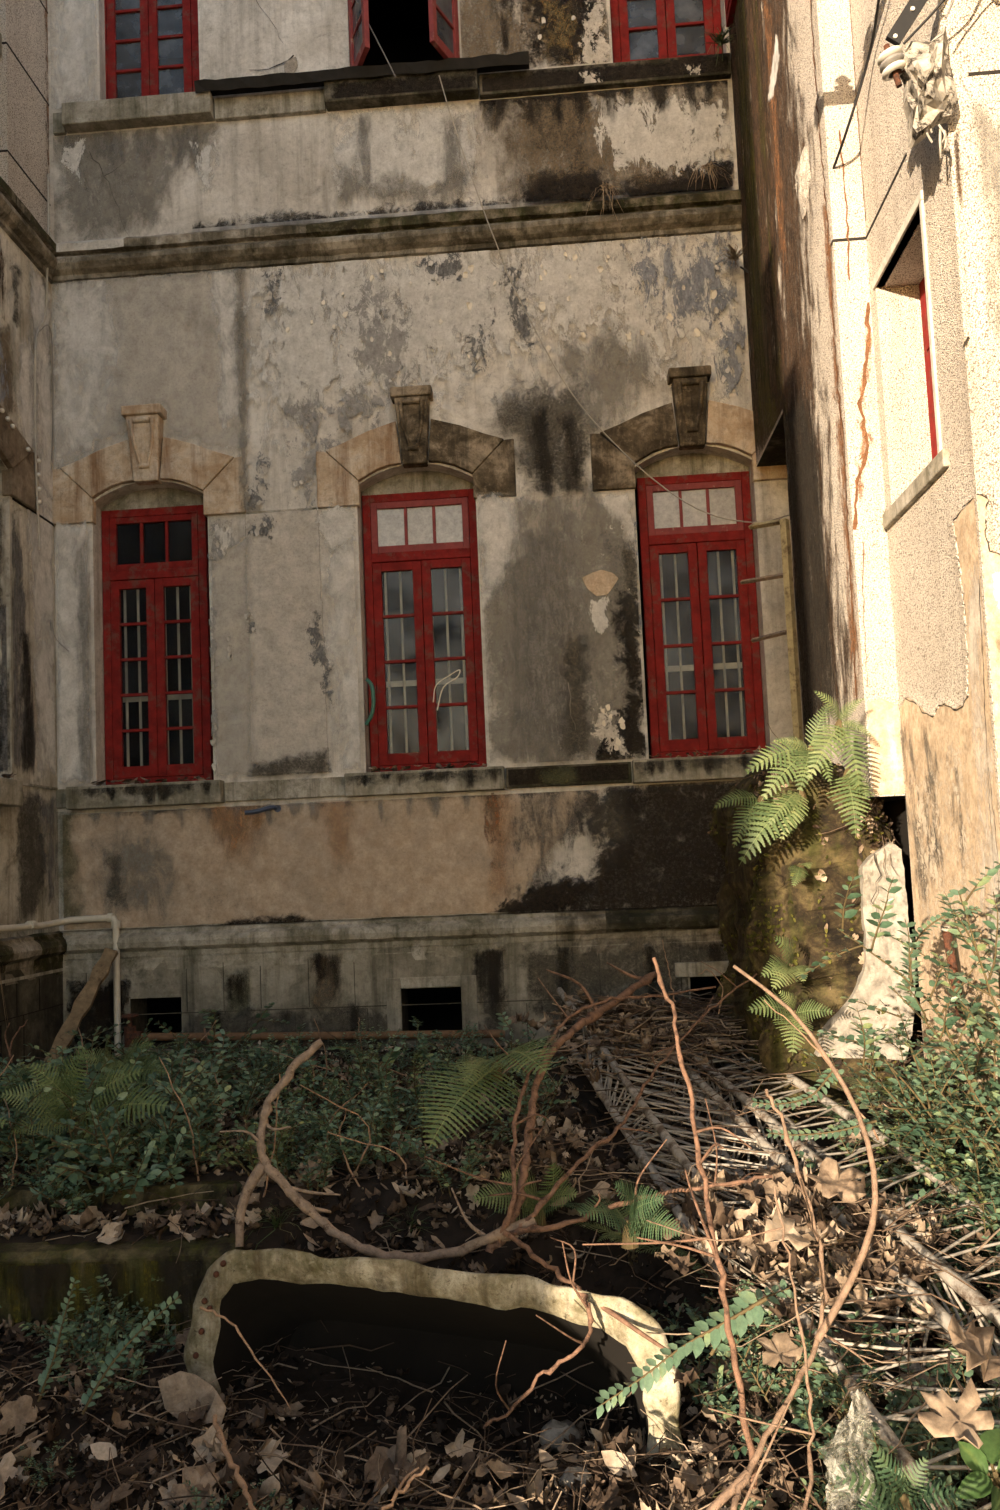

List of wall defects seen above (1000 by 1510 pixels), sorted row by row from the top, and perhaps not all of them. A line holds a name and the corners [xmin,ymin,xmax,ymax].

leakage [0,243,211,918]
leakage [54,123,216,240]
leakage [197,267,250,508]
peeling [306,610,337,708]
leakage [248,541,411,819]
peeling [207,231,750,589]
leakage [193,0,787,456]
leakage [425,324,763,914]
peeling [580,489,642,635]
peeling [590,701,632,756]
crack [810,0,871,698]
spalling [867,488,1000,1096]